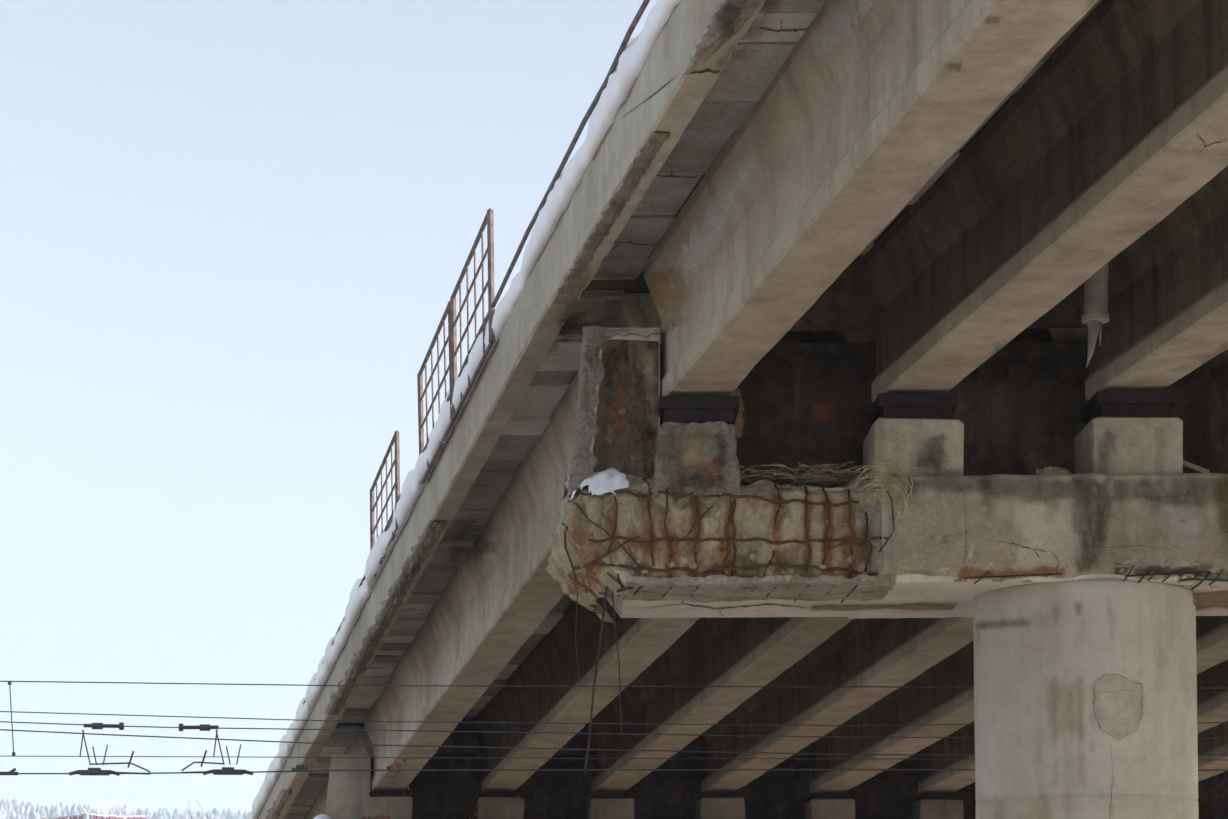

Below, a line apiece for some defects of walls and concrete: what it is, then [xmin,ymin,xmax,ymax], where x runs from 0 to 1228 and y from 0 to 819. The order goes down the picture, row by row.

spalling [685,0,762,75]
spalling [546,326,956,623]
spalling [954,565,1063,584]
spalling [1116,560,1228,610]